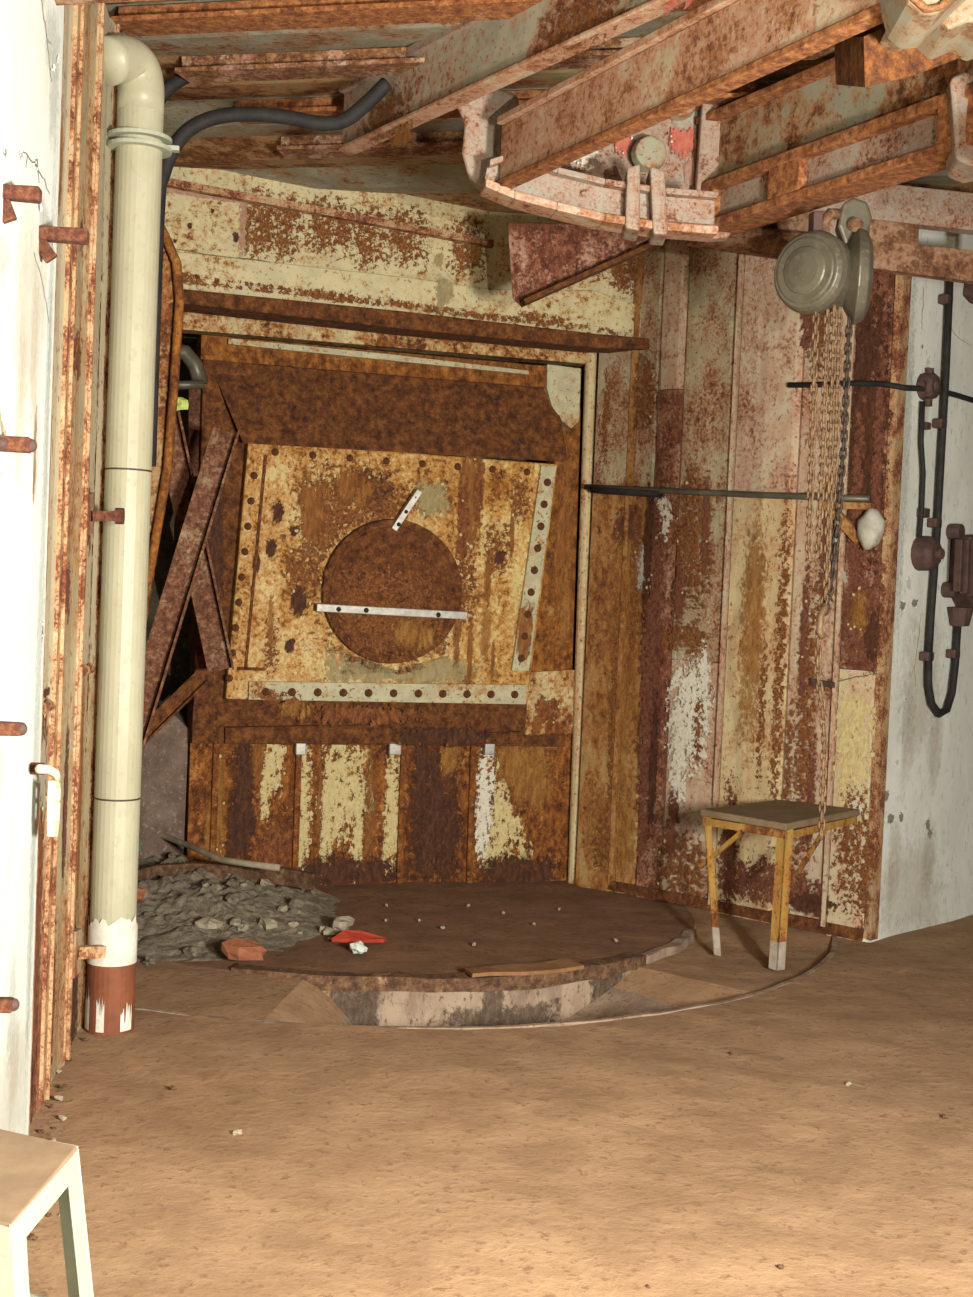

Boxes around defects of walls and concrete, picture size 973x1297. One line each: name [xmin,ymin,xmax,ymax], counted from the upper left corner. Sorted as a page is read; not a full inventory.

corrosion [535,0,637,67]
corrosion [166,180,657,442]
corrosion [62,437,97,928]
corrosion [225,448,564,886]
corrosion [583,274,895,930]
corrosion [50,922,79,1085]